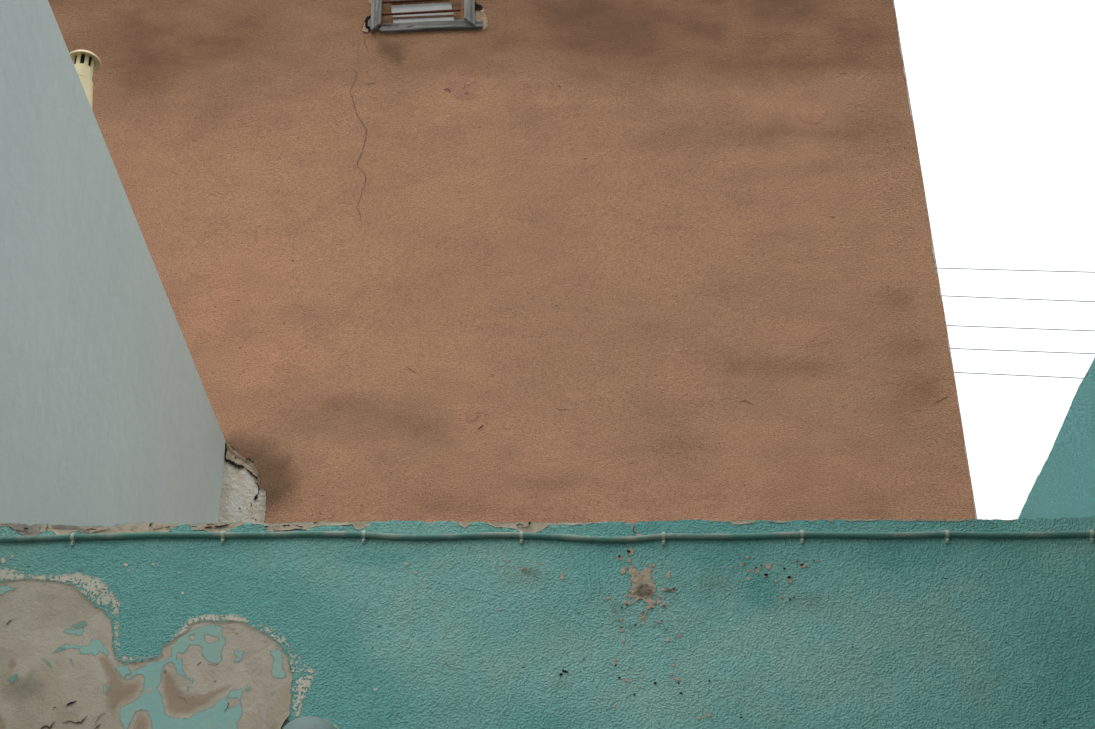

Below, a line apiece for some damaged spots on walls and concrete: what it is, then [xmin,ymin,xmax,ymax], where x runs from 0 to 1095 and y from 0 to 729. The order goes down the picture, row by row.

crack [350,40,372,220]
flaking render [0,442,370,536]
flaking render [0,555,316,729]
peeling [605,547,681,681]
peeling [730,556,819,583]